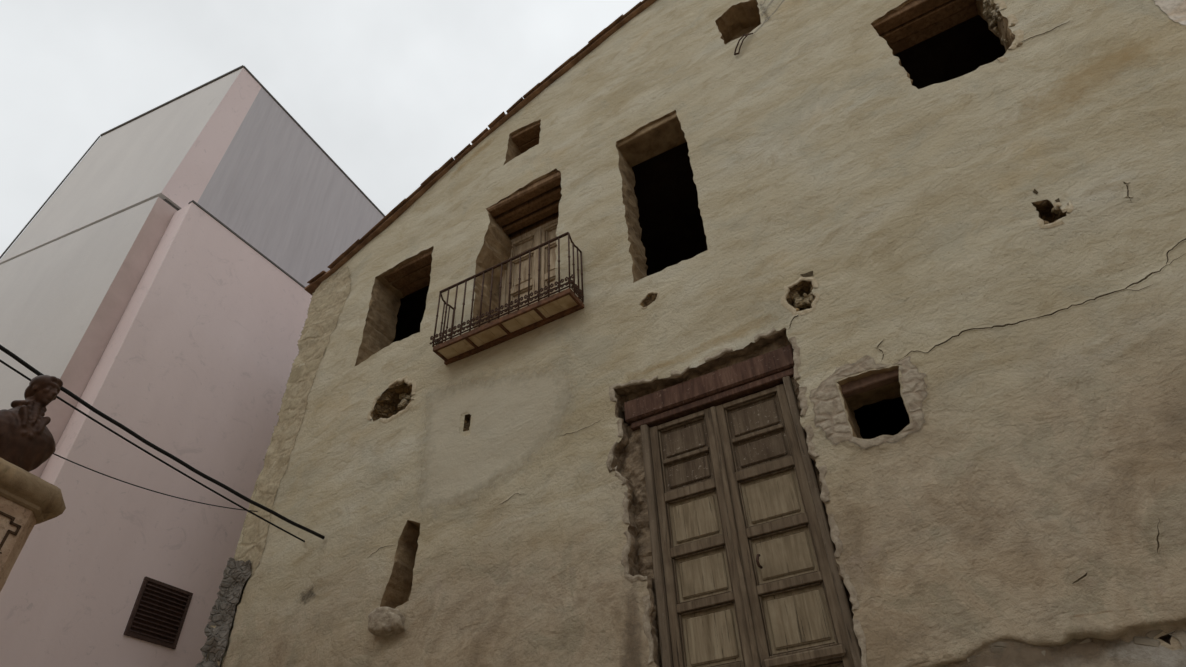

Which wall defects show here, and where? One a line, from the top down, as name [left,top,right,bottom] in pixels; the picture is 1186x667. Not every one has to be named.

spalling [994,0,1024,62]
peeling [1153,0,1186,25]
spalling [1031,189,1074,229]
spalling [781,271,820,316]
crack [875,236,1186,362]
spalling [367,375,416,423]
flaking render [615,335,794,411]
flaking render [791,377,802,414]
flaking render [195,266,351,667]
flaking render [619,425,656,595]
flaking render [1008,630,1186,667]